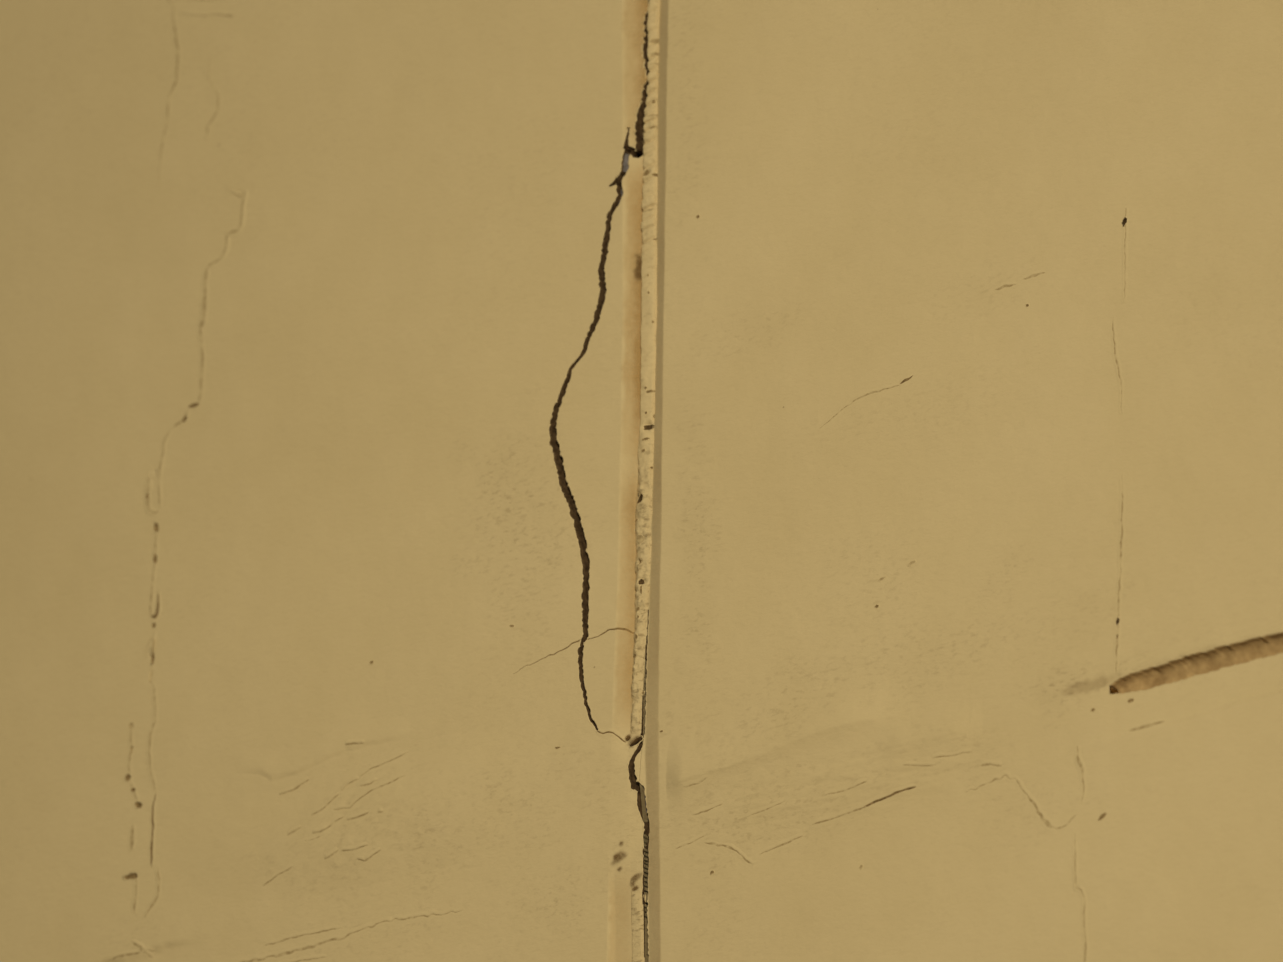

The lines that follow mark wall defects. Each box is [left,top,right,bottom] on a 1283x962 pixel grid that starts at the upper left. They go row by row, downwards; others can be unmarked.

crack [143,187,249,919]
crack [512,0,650,962]